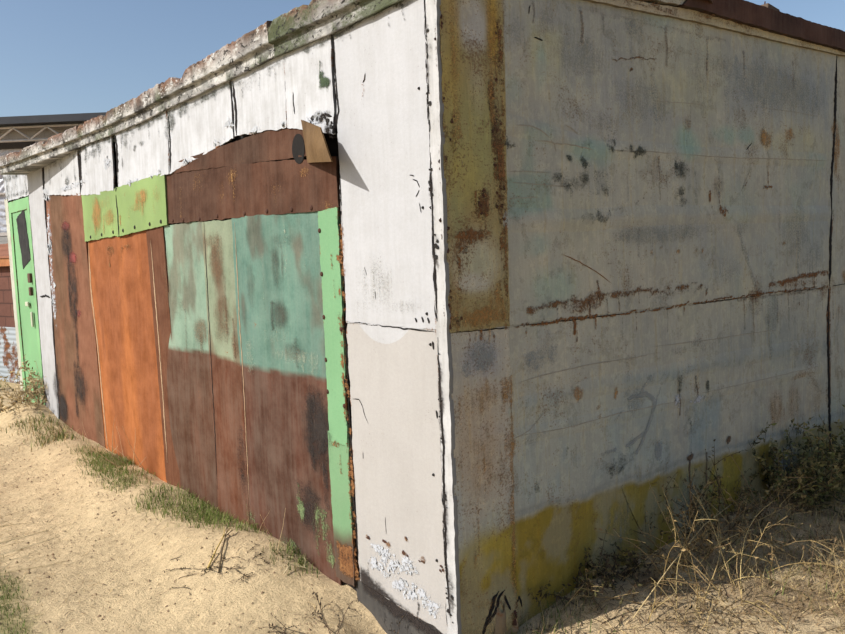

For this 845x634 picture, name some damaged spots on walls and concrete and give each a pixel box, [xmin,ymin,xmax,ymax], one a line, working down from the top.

rust [211,238,223,283]
rust [330,224,345,276]
rust [455,27,831,414]
rust [46,193,181,488]
rust [333,280,350,397]
rust [301,393,360,580]
water stain [360,570,440,634]